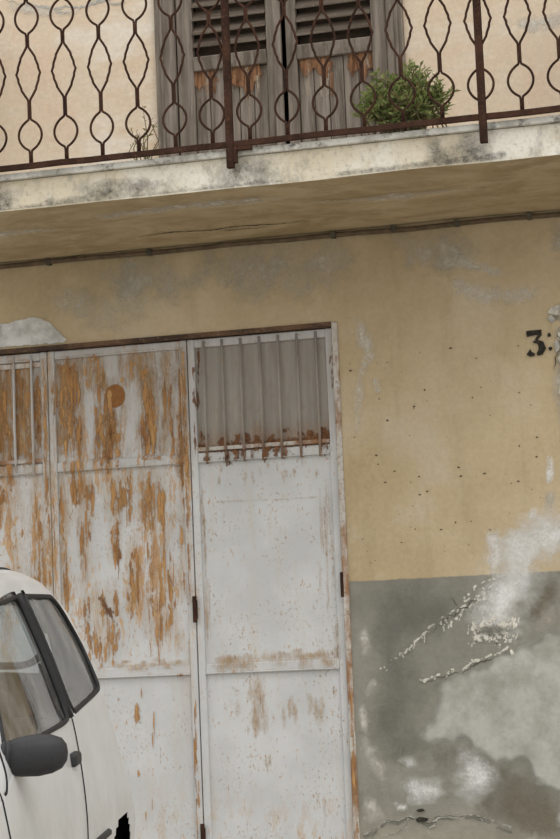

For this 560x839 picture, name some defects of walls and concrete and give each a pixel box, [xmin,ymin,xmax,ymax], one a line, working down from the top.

peeling [348,51,373,80]
peeling [194,70,219,101]
rust [0,348,330,669]
leakage [483,512,560,625]
crack [380,569,510,671]
crack [418,617,522,684]
leakage [463,758,490,790]
leakage [408,781,440,800]
crack [364,814,511,839]